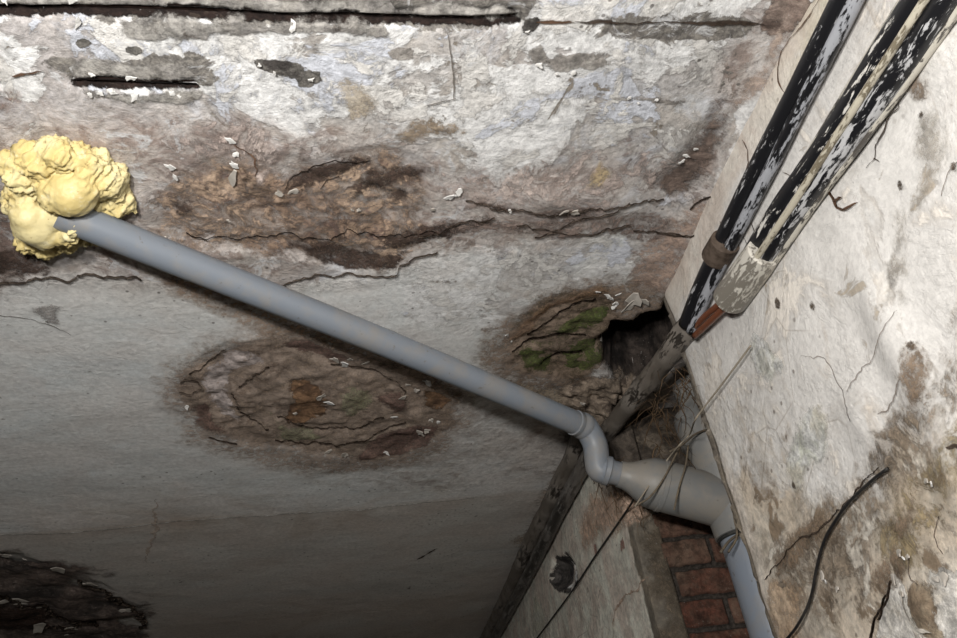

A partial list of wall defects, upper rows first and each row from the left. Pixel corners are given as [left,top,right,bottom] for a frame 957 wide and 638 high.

crack [0,273,141,285]
crack [282,188,690,286]
spalling [165,331,471,473]
spalling [480,279,673,425]
water stain [767,343,957,638]
spalling [0,549,154,638]